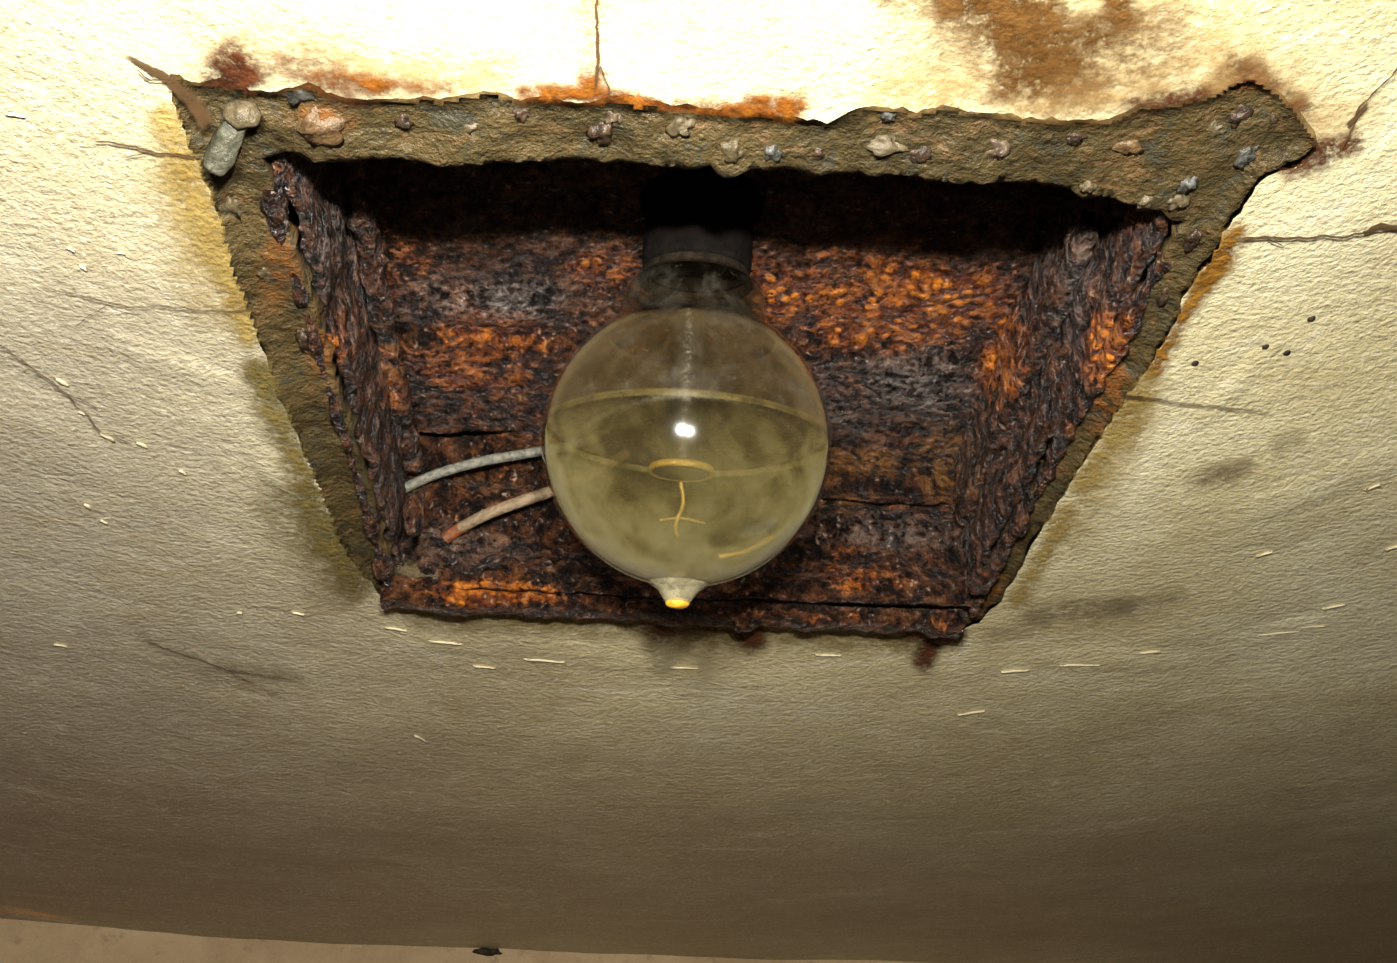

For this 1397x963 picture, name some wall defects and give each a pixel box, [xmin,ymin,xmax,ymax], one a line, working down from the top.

corrosion [205,42,264,90]
corrosion [292,72,451,94]
crack [594,0,610,97]
corrosion [519,74,807,119]
corrosion [931,0,1160,108]
corrosion [1131,55,1311,114]
crack [1240,222,1397,247]
spalling [170,74,1317,626]